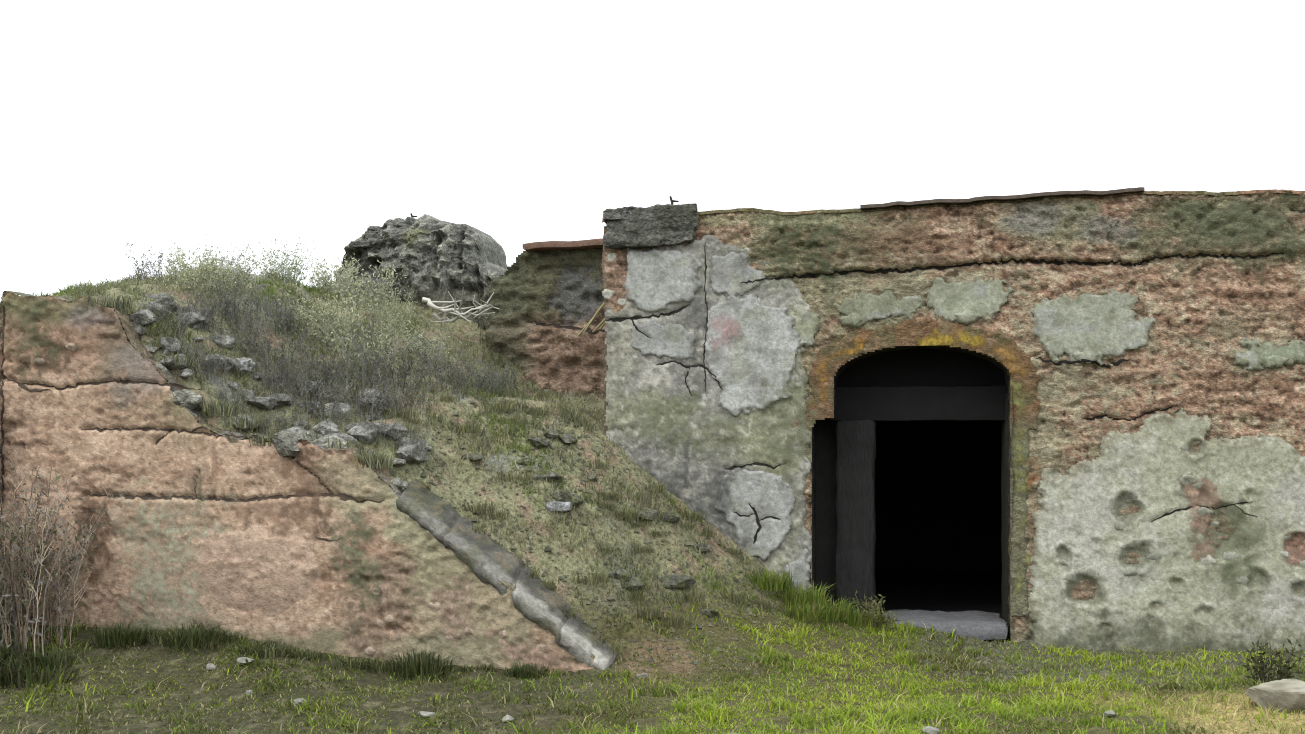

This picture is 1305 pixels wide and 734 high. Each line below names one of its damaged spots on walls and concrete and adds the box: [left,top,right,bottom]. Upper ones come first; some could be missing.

crack [741,252,1284,283]
crack [528,243,723,396]
crack [1036,357,1130,368]
crack [0,296,202,513]
crack [82,426,384,503]
crack [725,462,787,470]
crack [734,503,781,544]
peeling [1022,408,1305,652]
crack [1151,501,1258,522]